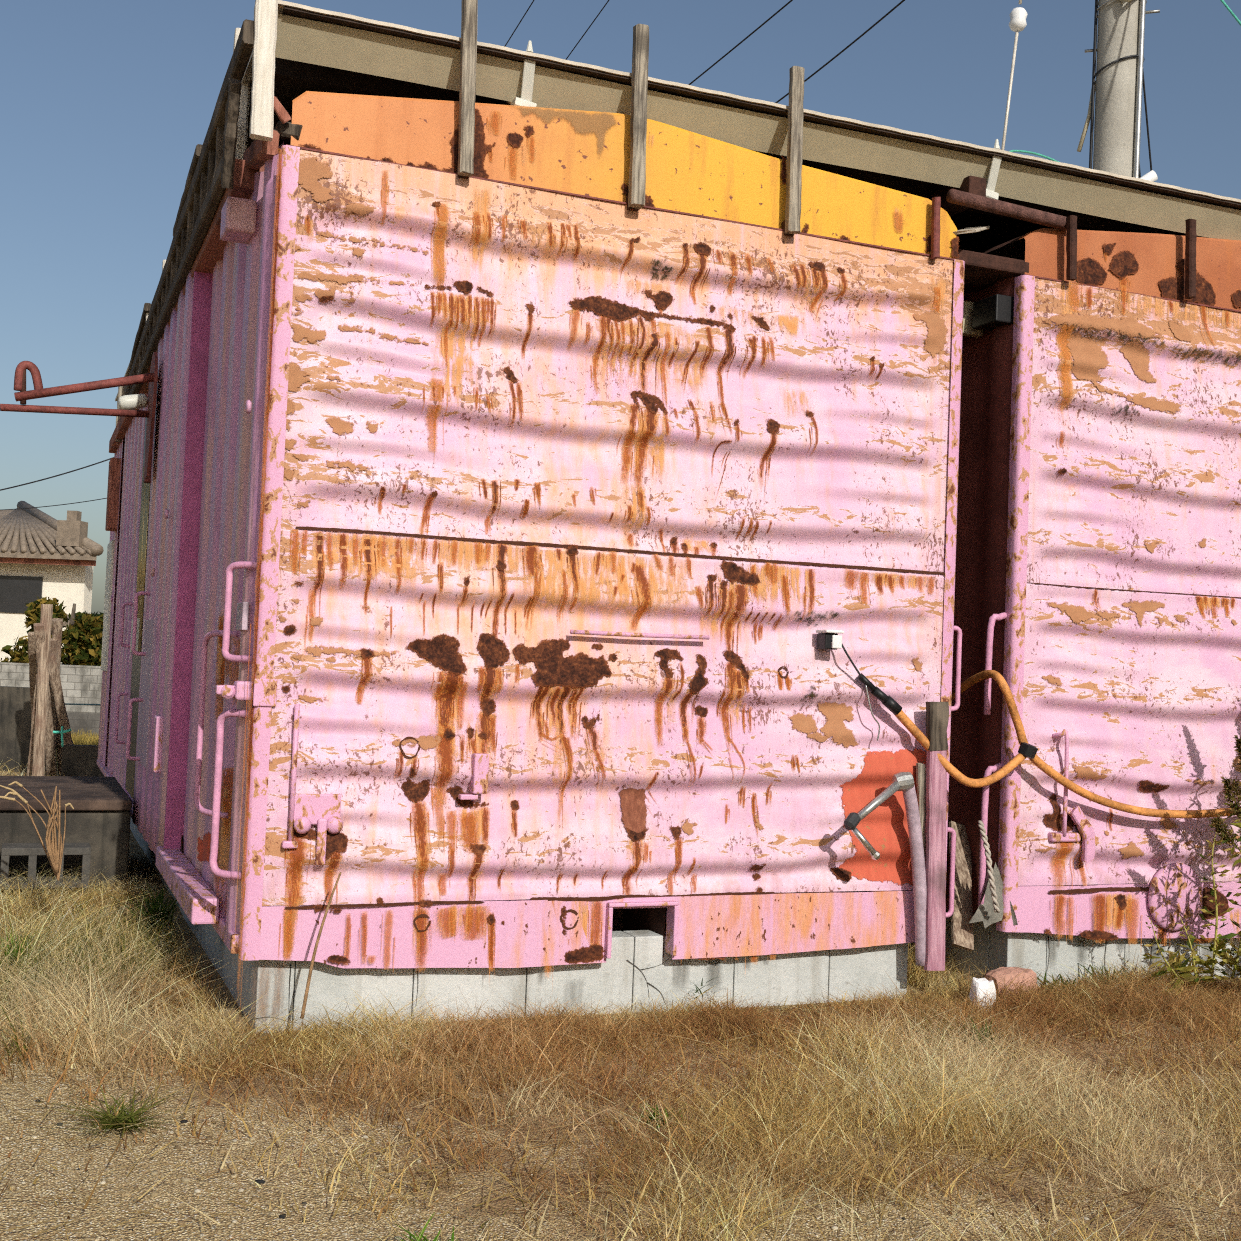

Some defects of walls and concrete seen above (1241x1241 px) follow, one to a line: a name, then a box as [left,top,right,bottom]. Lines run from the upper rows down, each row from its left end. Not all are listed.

corrosion [367,124,459,224]
corrosion [470,108,580,263]
corrosion [423,201,496,450]
peeling [1043,311,1192,413]
corrosion [1056,243,1241,410]
corrosion [284,828,348,958]
corrosion [395,593,618,910]
corrosion [620,772,658,895]
corrosion [568,242,839,833]
peeling [788,701,927,886]
peeling [1041,674,1063,686]
peeling [1046,600,1186,627]